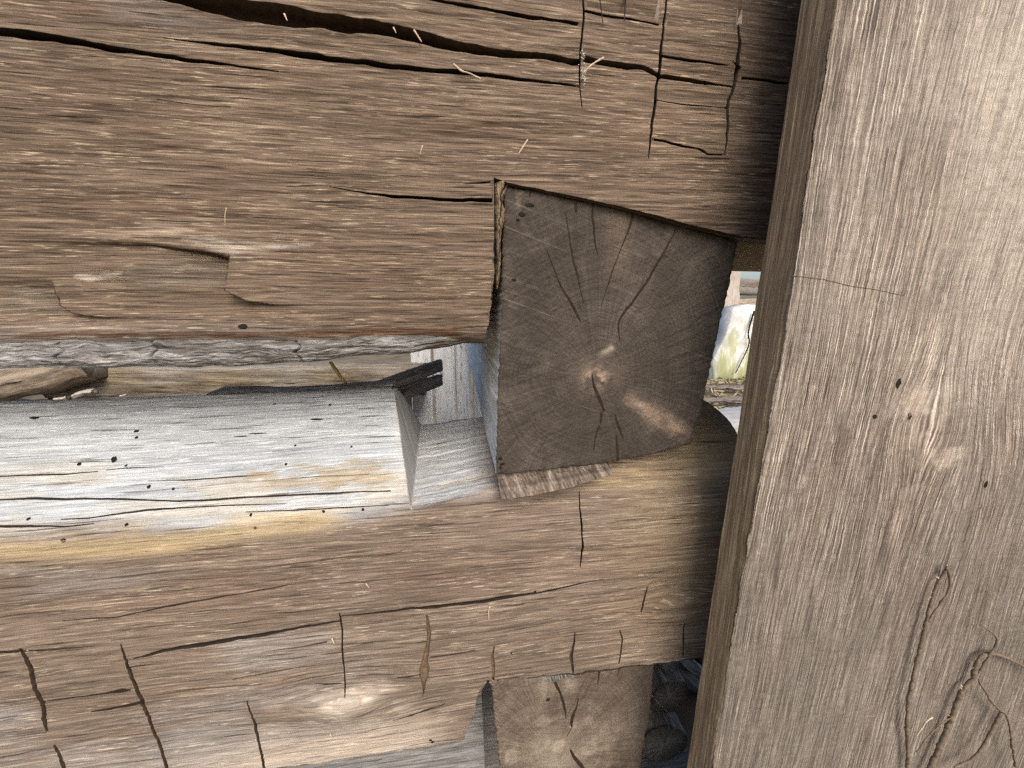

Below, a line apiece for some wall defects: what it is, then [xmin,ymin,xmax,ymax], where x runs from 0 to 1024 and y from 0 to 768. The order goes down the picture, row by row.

crack [0,0,790,160]
crack [222,213,311,221]
crack [287,178,492,206]
crack [537,203,691,353]
crack [591,374,623,461]
crack [45,491,604,714]
crack [393,703,445,721]